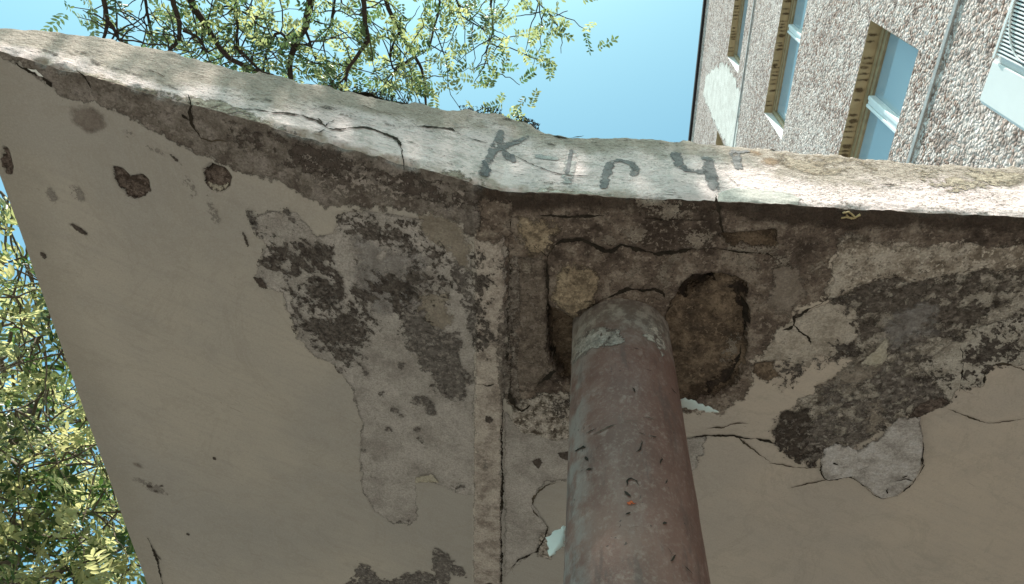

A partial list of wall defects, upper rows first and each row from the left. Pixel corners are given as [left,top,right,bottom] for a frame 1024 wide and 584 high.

crack [240,103,588,176]
peeling [0,51,517,525]
crack [784,296,829,345]
crack [478,179,805,584]
spalling [476,185,1024,577]
crack [949,347,1024,424]
crack [692,423,825,488]
peeling [345,548,467,584]